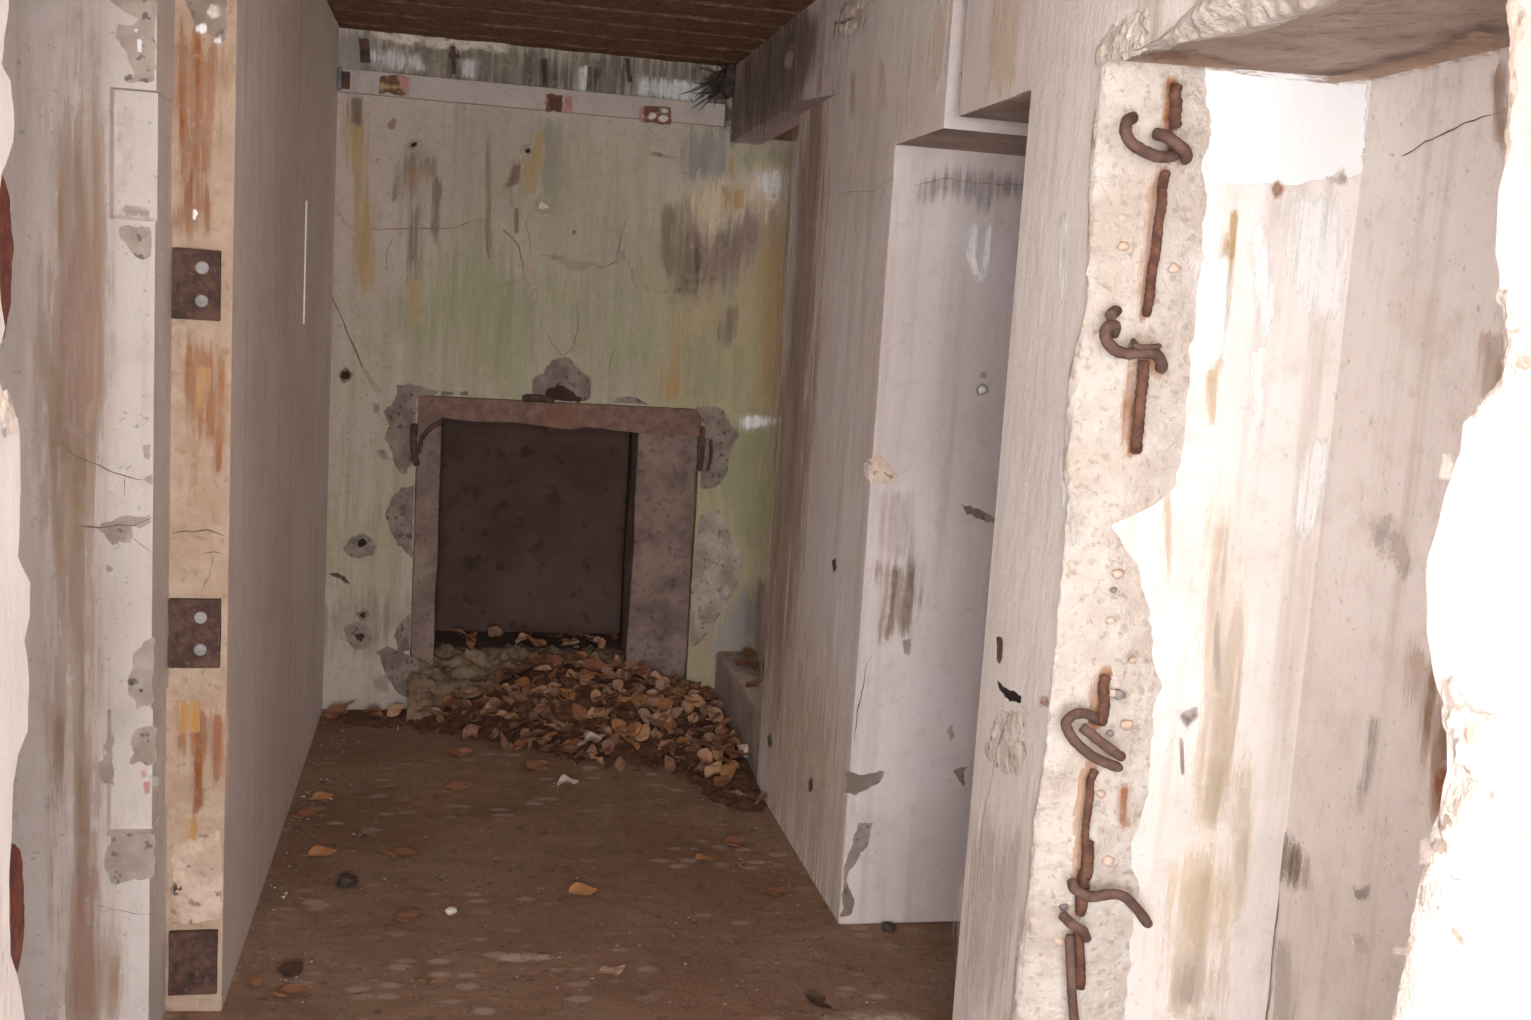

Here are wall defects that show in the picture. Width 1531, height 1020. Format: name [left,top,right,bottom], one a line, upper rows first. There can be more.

corrosion [174,23,224,233]
leakage [640,69,732,183]
corrosion [1140,50,1261,320]
corrosion [1309,31,1507,149]
leakage [660,198,791,430]
flaking render [1473,289,1531,418]
spalling [979,0,1339,1020]
corrosion [178,701,224,840]
flaking render [840,822,873,917]
flaking render [844,771,884,795]
corrosion [1072,761,1096,879]
flaking render [1393,676,1504,1020]